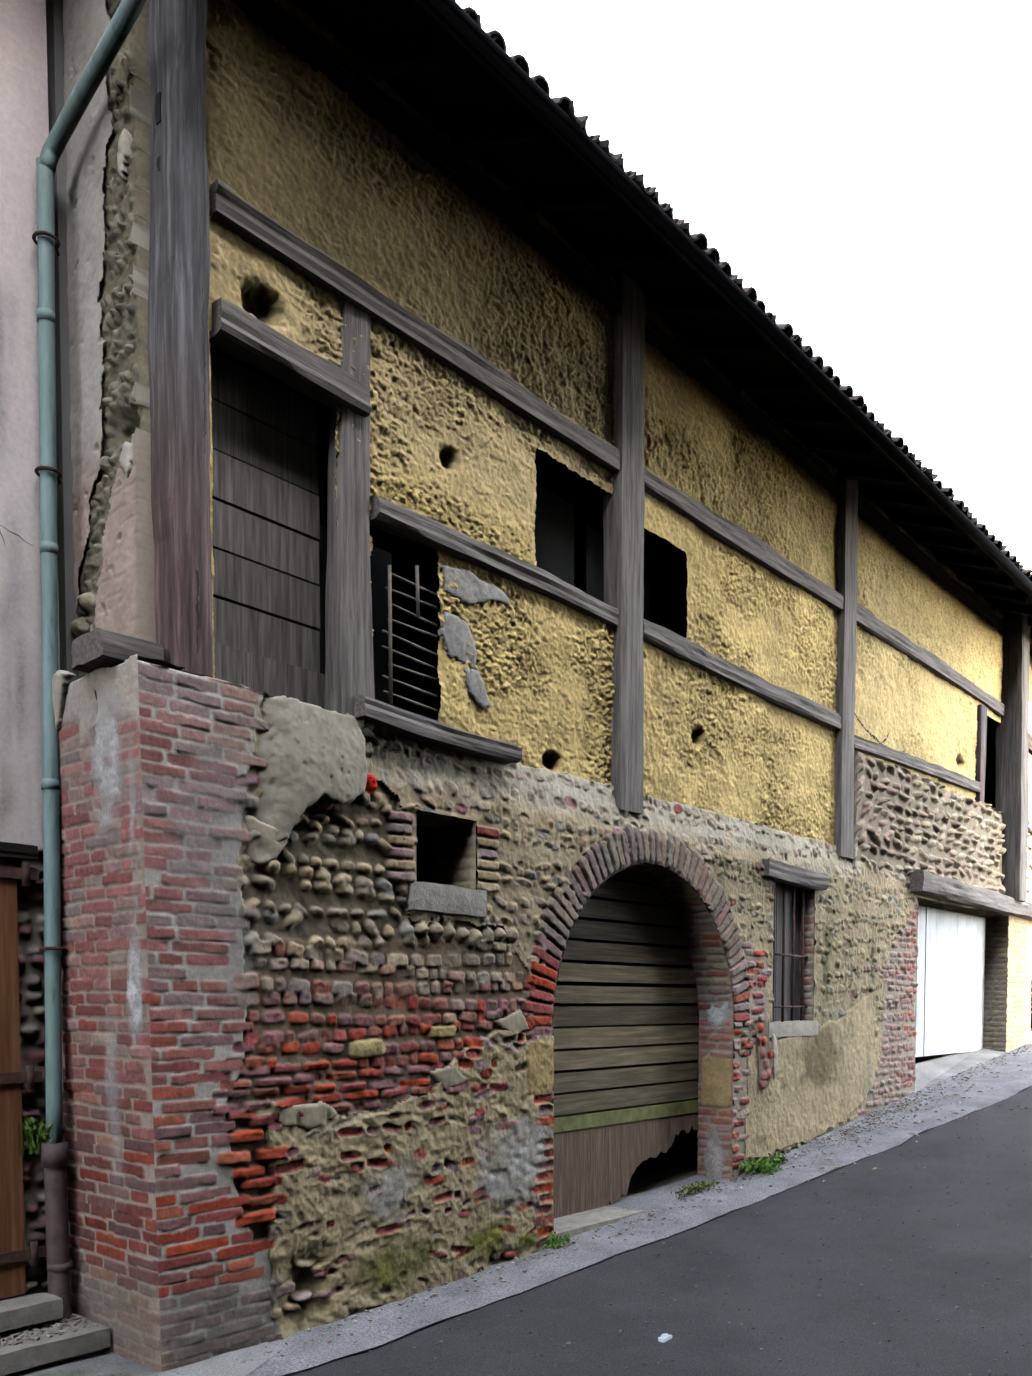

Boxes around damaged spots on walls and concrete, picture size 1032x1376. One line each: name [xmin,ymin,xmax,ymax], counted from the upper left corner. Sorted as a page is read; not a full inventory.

spalling [52,0,151,732]
spalling [261,777,535,1131]